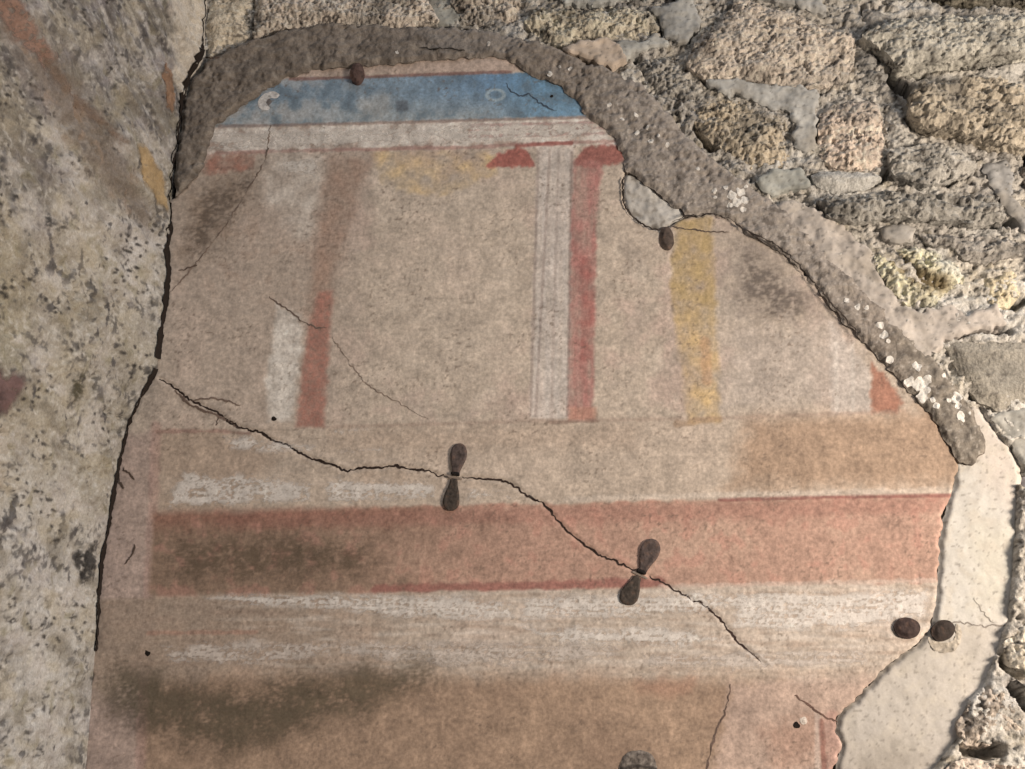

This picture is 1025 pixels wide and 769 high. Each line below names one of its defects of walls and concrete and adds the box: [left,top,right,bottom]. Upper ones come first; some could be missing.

crack [95,0,765,666]
water stain [121,670,415,748]
crack [706,684,731,769]